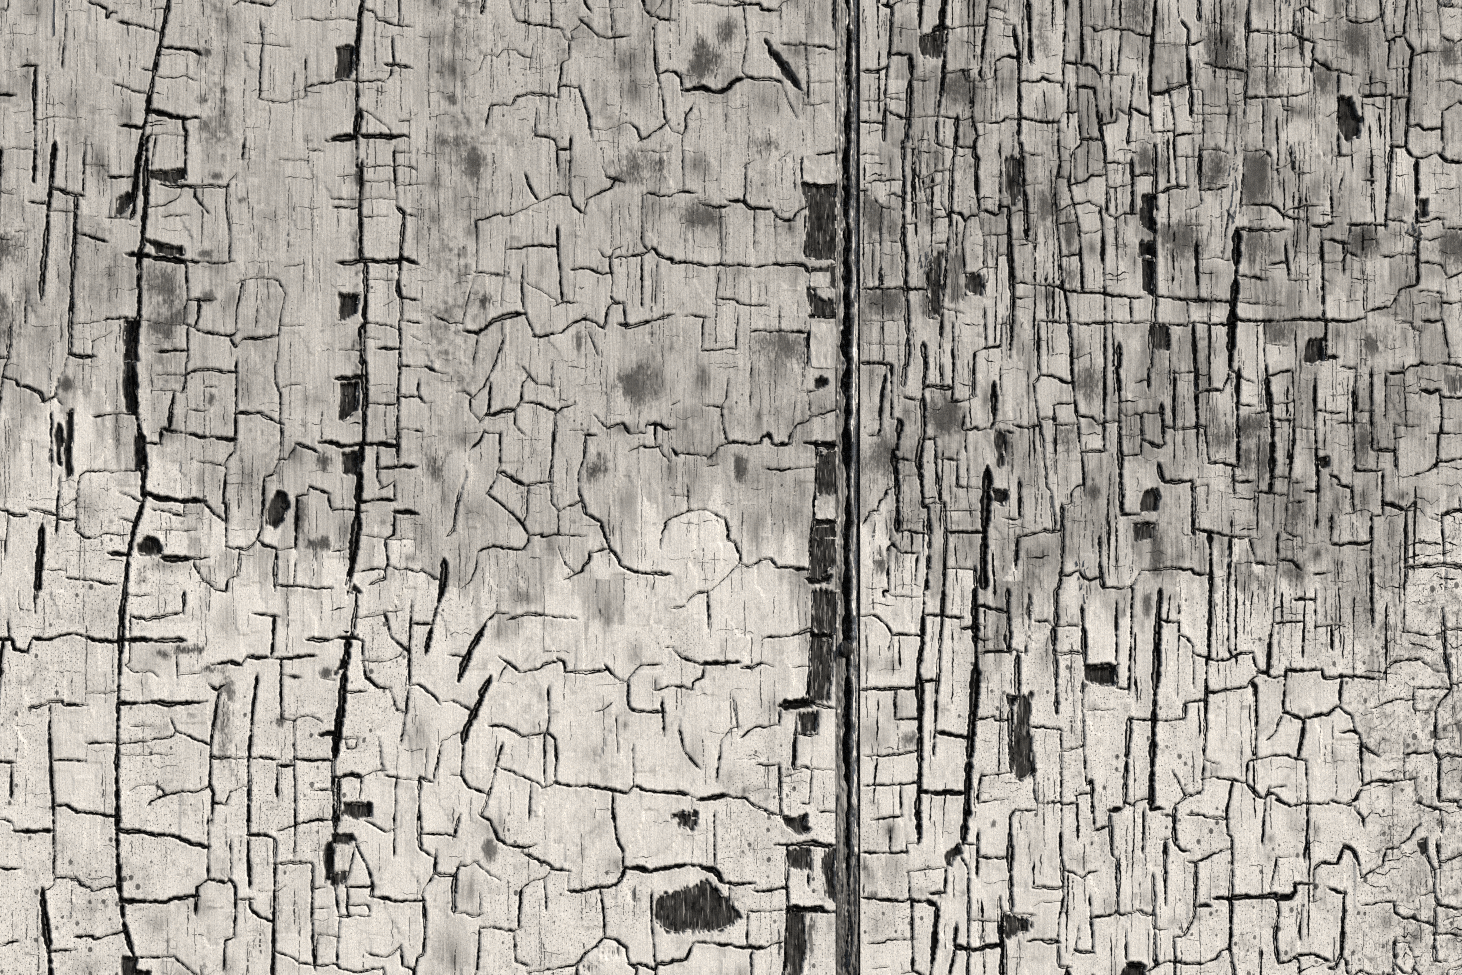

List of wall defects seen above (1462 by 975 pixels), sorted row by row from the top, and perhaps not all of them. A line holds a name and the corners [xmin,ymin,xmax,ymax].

peeling [1336,97,1360,141]
peeling [801,155,838,388]
crack [0,0,840,975]
peeling [782,441,840,735]
peeling [1006,692,1033,781]
peeling [633,880,741,934]
peeling [783,814,836,975]
peeling [1121,965,1145,975]